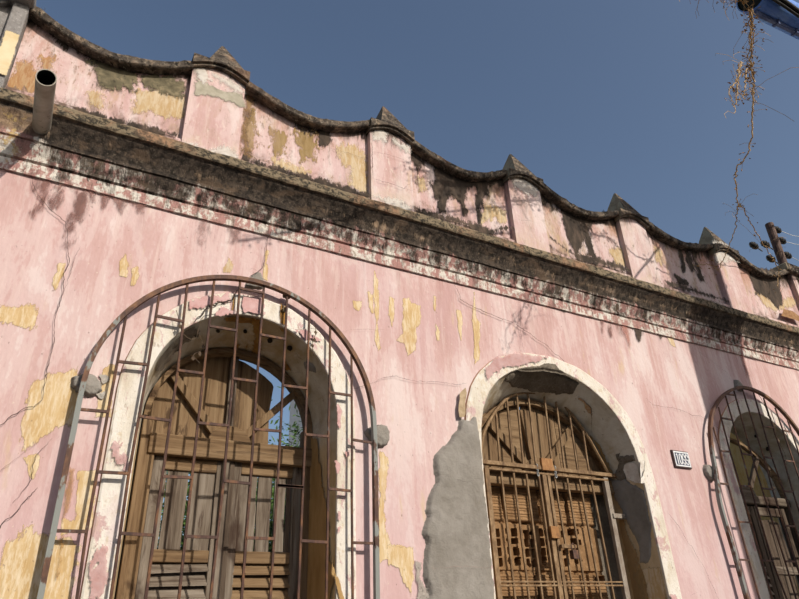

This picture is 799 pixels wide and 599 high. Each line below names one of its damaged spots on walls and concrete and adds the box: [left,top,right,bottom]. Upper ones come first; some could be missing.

peeling [0,31,57,93]
leakage [74,105,180,137]
leakage [63,190,145,236]
leakage [414,167,514,235]
leakage [542,196,631,272]
crack [1,136,77,425]
corrosion [224,295,262,354]
leakage [750,267,786,309]
peeling [19,369,78,479]
crack [0,432,52,528]
peeling [0,470,109,599]
peeling [378,451,414,592]